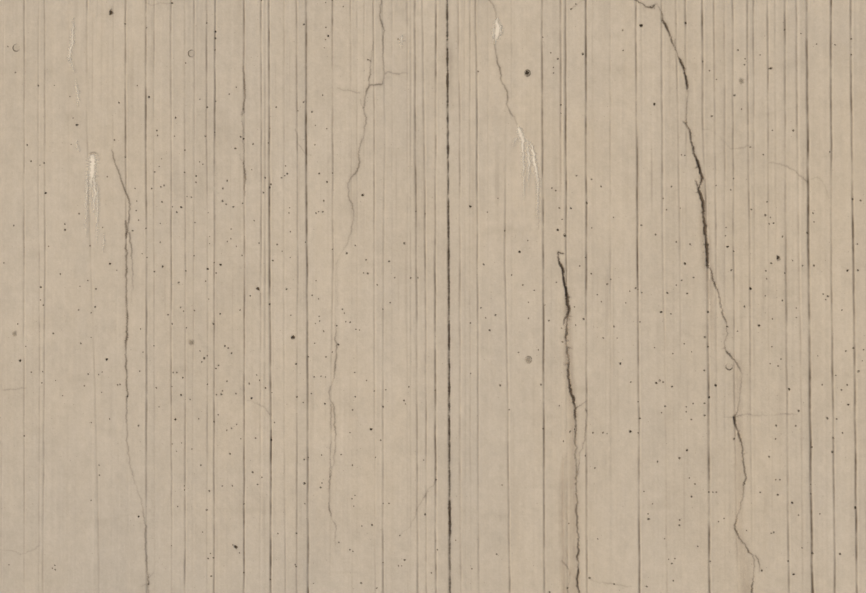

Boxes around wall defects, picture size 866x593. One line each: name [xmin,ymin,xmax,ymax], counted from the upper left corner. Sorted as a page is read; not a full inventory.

crack [638,2,688,89]
crack [686,123,718,290]
crack [558,252,576,437]